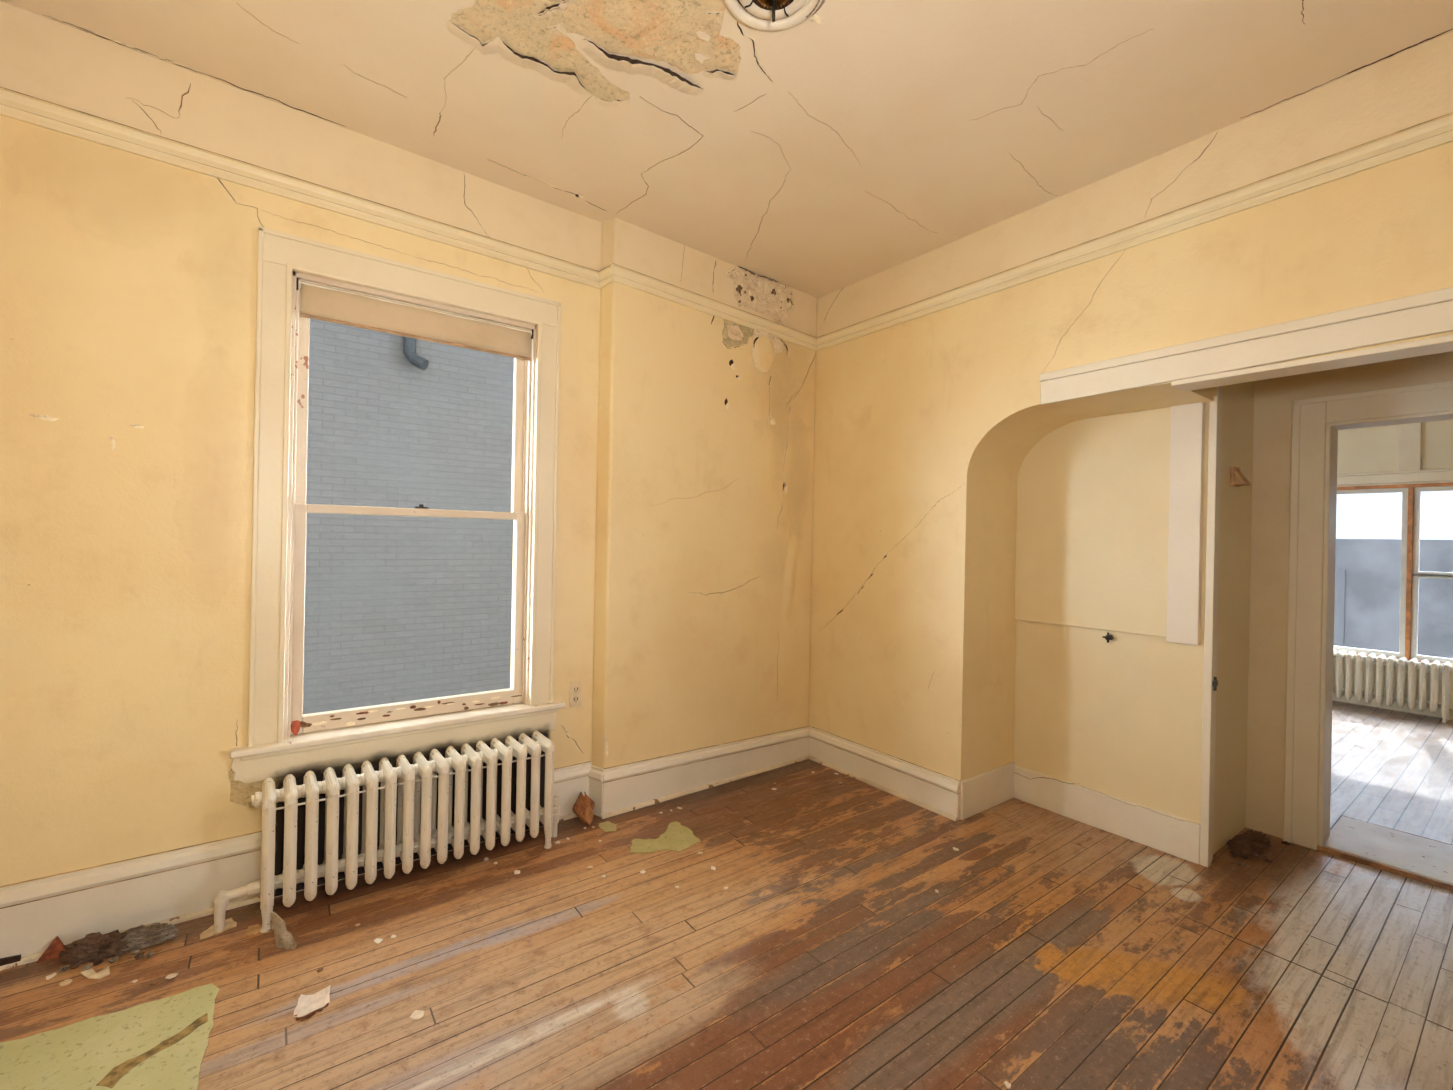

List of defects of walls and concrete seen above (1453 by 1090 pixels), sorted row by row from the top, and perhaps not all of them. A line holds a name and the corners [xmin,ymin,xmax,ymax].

crack [43,14,346,131]
crack [434,49,474,133]
crack [464,97,703,238]
flaking render [447,0,741,108]
crack [680,22,937,324]
crack [972,29,1152,130]
crack [1145,29,1452,216]
crack [211,176,544,292]
flaking render [720,264,795,380]
crack [1045,249,1126,369]
crack [820,487,960,630]
flaking render [227,769,276,808]